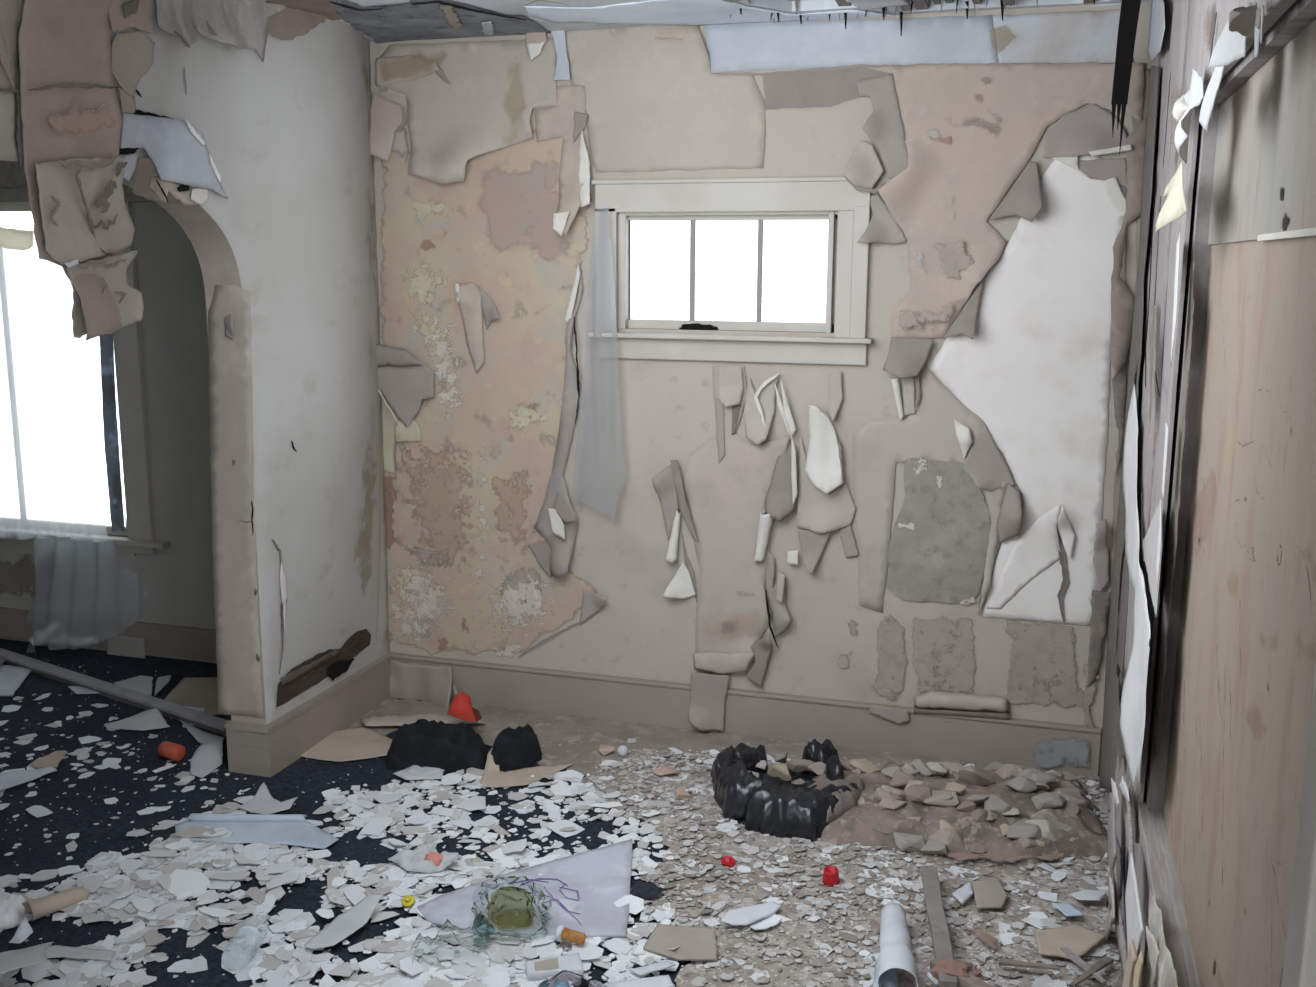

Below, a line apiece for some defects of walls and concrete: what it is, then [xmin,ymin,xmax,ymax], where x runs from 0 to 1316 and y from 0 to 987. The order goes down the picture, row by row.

peeling [0,0,144,340]
flaking render [149,176,209,206]
peeling [208,284,371,718]
peeling [376,282,500,650]
peeling [487,263,583,658]
peeling [155,0,1121,73]
peeling [744,371,859,575]
flaking render [873,155,1127,708]
peeling [1116,383,1168,801]
peeling [1171,233,1180,362]
peeling [1199,1,1264,132]
flaking render [1122,852,1178,987]